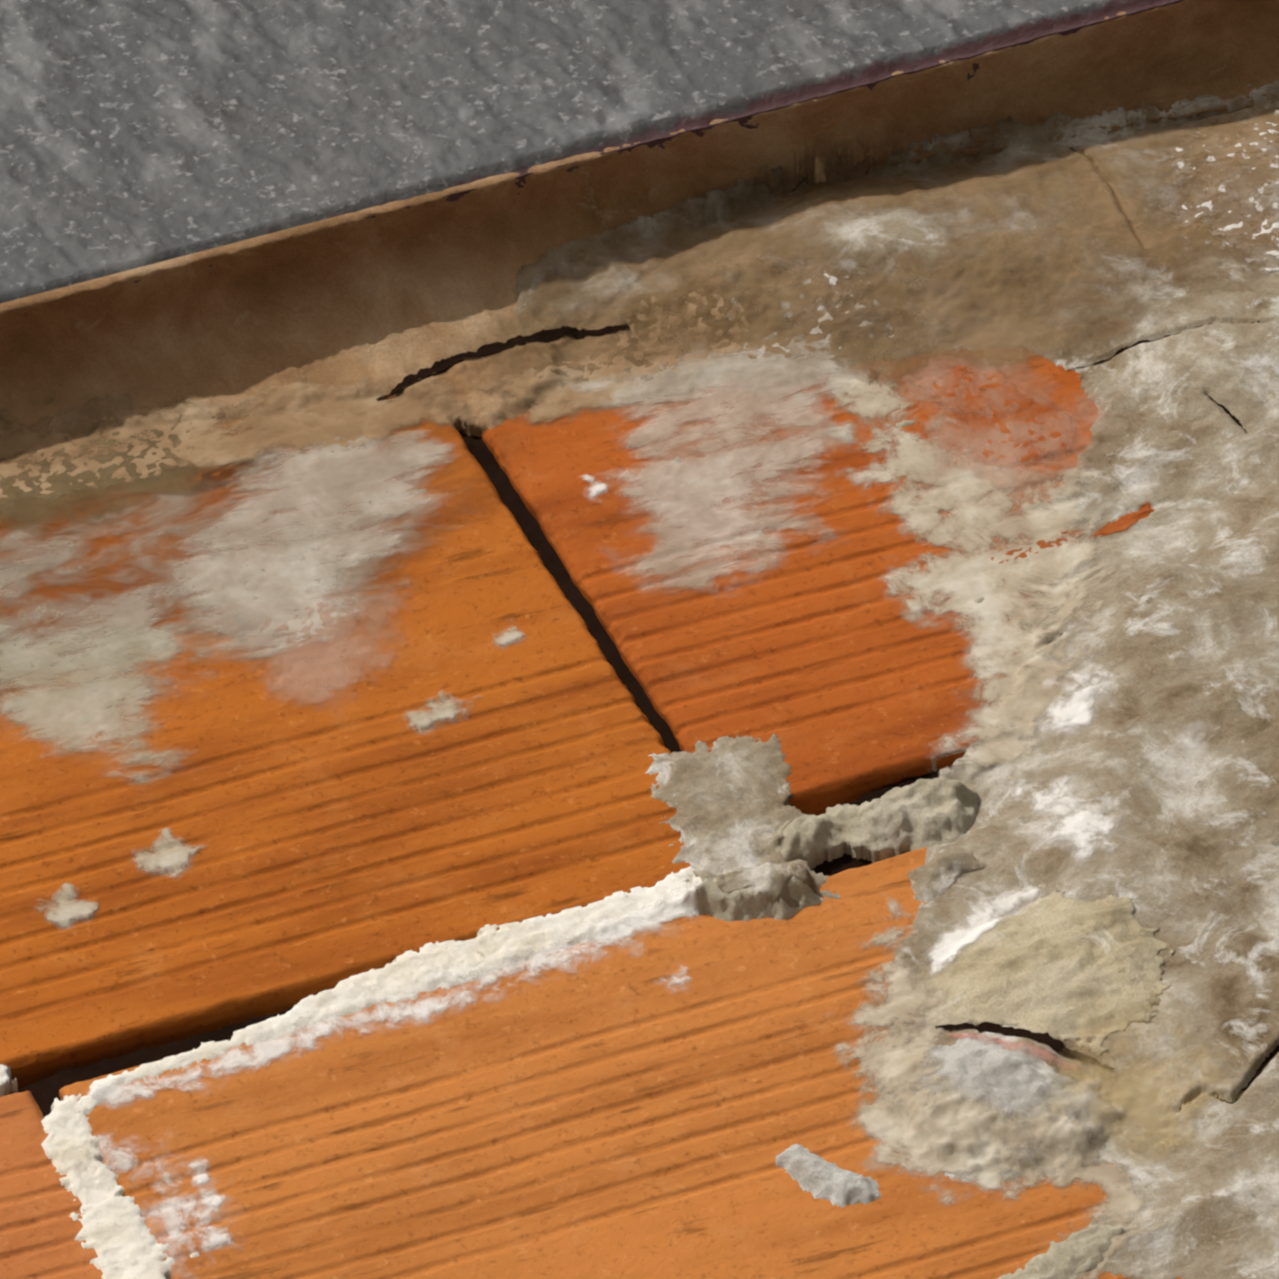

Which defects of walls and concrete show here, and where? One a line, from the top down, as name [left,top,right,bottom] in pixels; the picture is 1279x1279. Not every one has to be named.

crack [376,324,630,400]
crack [1068,321,1266,371]
spalling [915,364,1076,470]
crack [1206,394,1247,433]
leakage [0,423,418,648]
spalling [991,502,1151,564]
efflorescence [90,887,697,1104]
crack [935,1022,1115,1070]
crack [1179,1045,1279,1112]
efflorescence [99,1136,132,1169]
efflorescence [151,1173,212,1241]